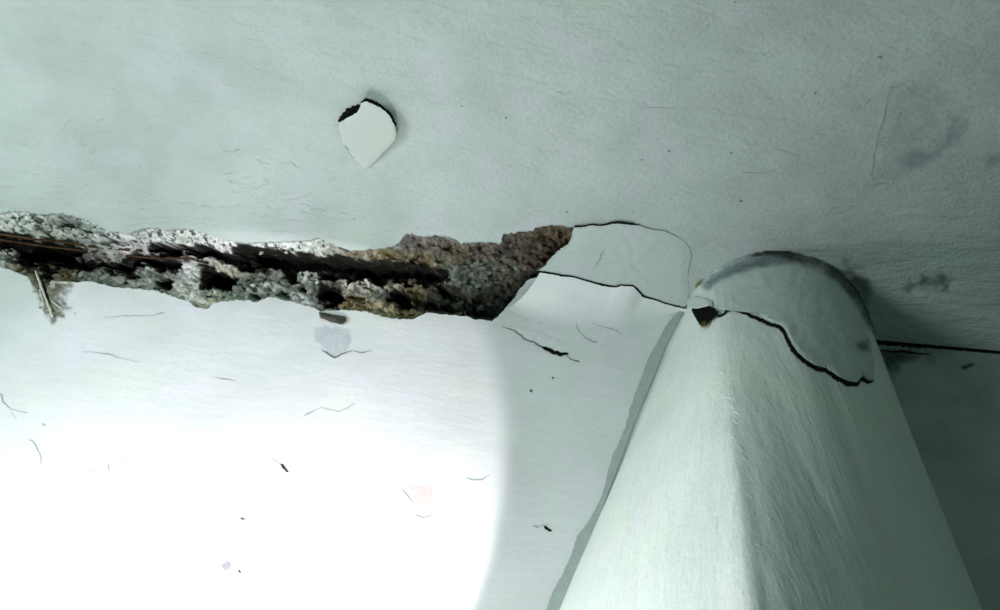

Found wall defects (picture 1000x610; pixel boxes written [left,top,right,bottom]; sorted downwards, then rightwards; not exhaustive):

peeling [338,98,396,168]
crack [574,221,674,235]
spalling [0,212,574,321]
crack [538,271,687,309]
crack [502,324,622,362]
crack [718,310,875,386]
crack [880,348,930,356]